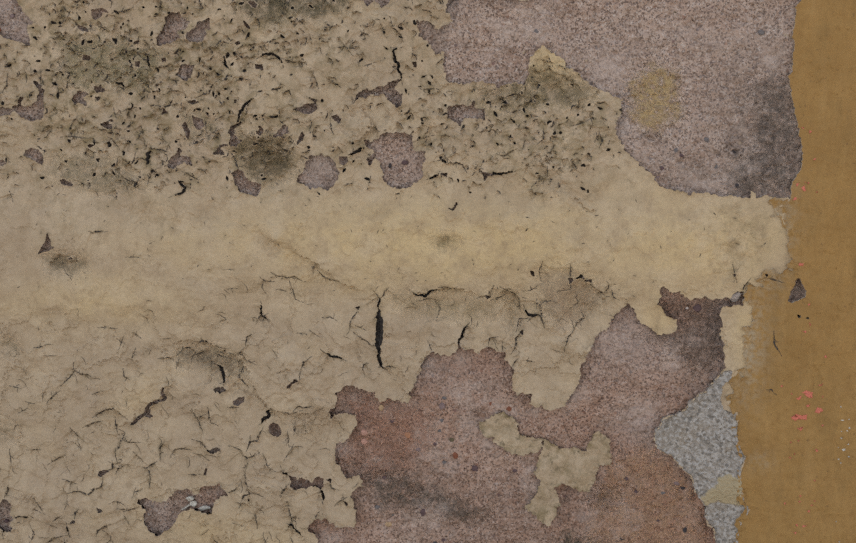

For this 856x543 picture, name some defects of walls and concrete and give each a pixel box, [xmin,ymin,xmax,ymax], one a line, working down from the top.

spalling [0,0,62,46]
spalling [142,6,211,81]
spalling [0,60,69,121]
spalling [72,80,105,106]
spalling [413,0,803,199]
spalling [213,113,289,155]
spalling [296,79,432,195]
spalling [226,169,267,196]
crack [2,225,654,543]
spalling [308,286,749,543]
spalling [0,499,13,532]
spalling [138,483,228,536]